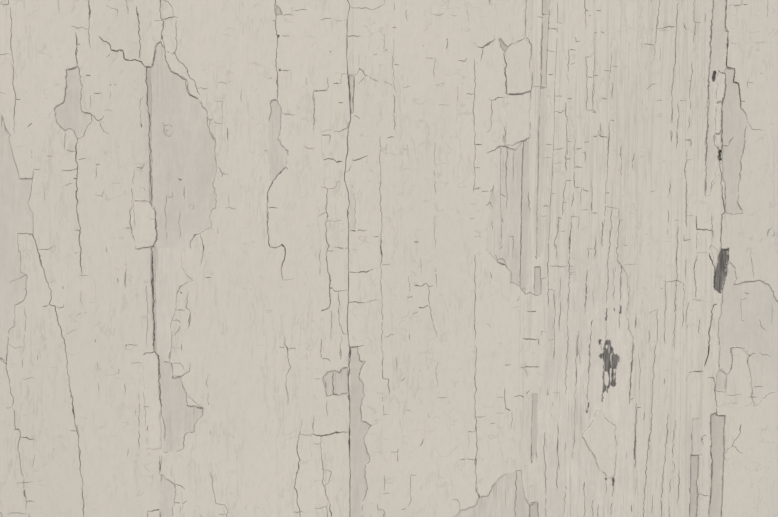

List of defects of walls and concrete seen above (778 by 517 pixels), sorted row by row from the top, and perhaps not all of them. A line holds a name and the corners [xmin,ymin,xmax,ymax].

crack [0,0,32,133]
crack [1,233,87,517]
crack [23,131,103,276]
crack [69,0,242,517]
peeling [131,41,217,453]
crack [267,167,295,280]
crack [269,0,307,115]
crack [294,0,410,517]
crack [408,216,437,335]
peeling [455,0,635,517]
crack [423,0,769,517]
peeling [704,0,778,406]